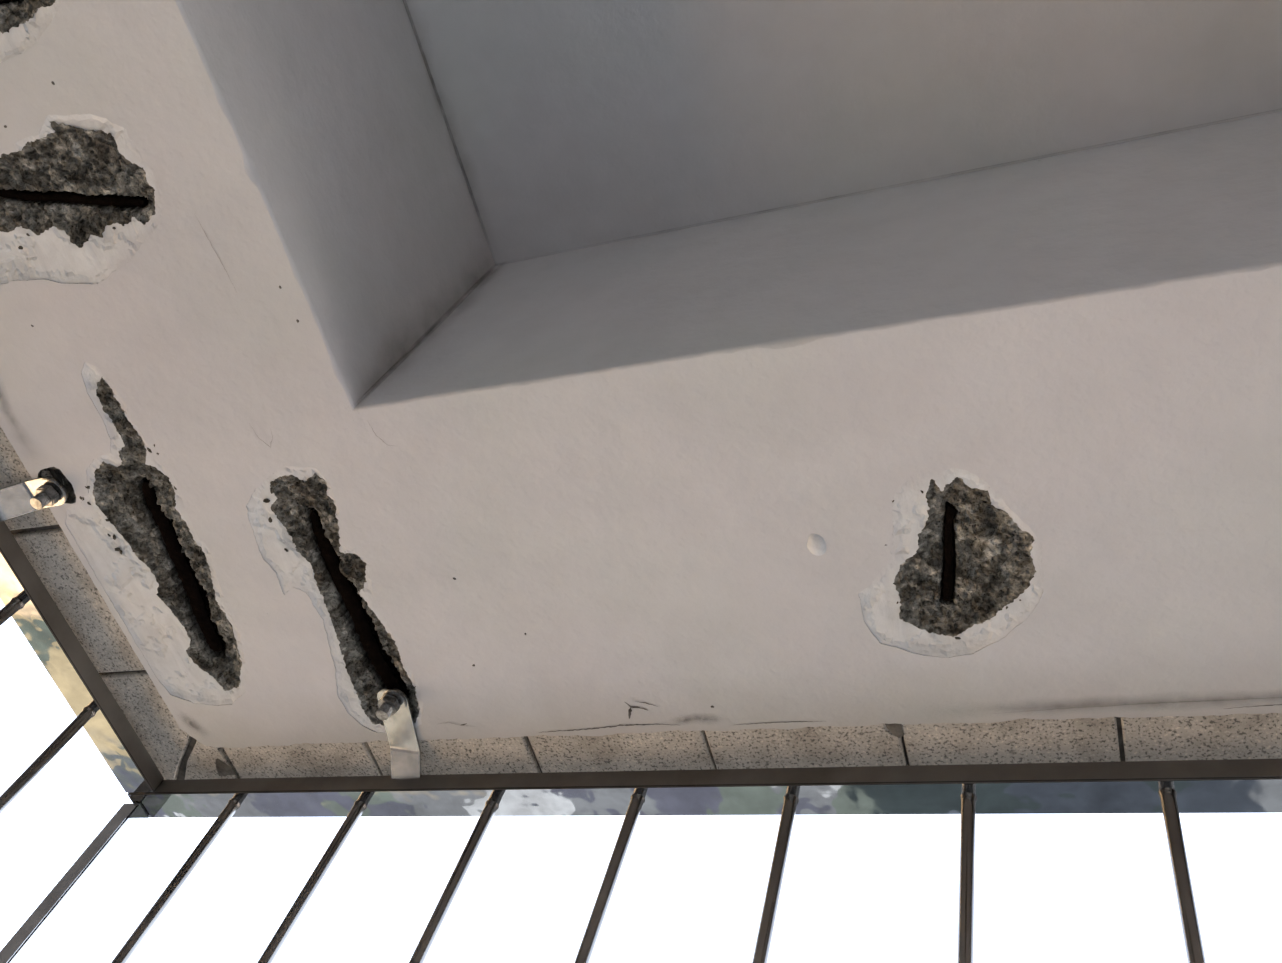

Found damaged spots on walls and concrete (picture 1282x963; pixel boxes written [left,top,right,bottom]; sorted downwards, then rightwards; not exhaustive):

spalling [0,0,63,63]
spalling [0,114,163,284]
spalling [37,362,248,706]
spalling [246,465,423,733]
spalling [858,467,1044,658]